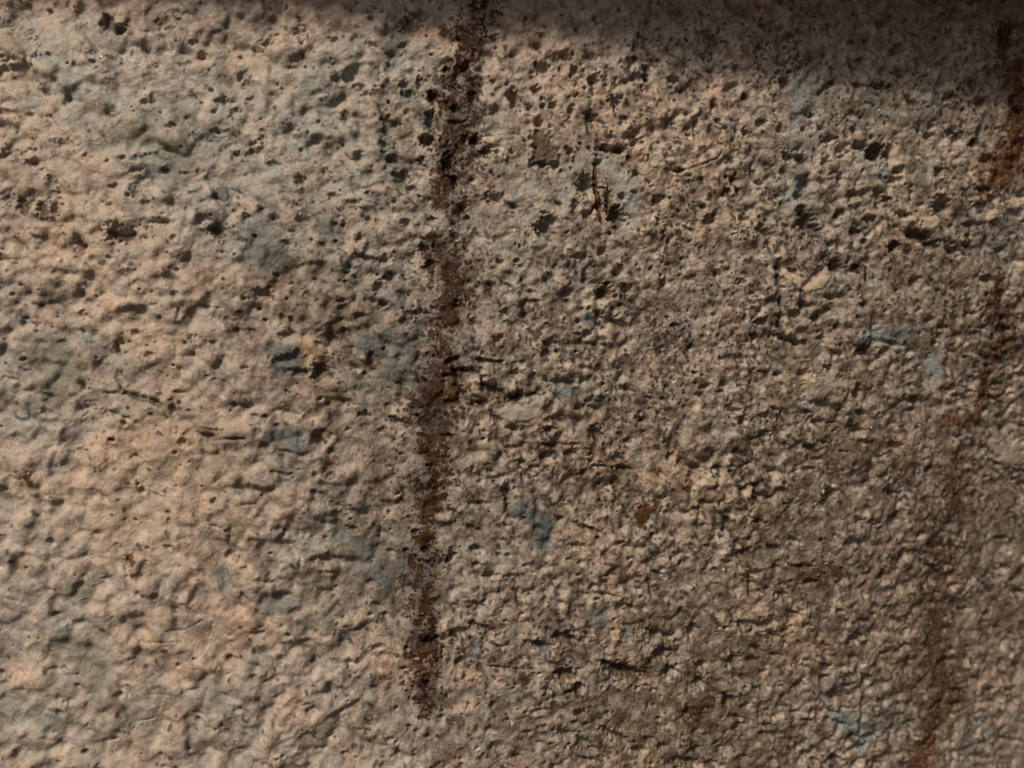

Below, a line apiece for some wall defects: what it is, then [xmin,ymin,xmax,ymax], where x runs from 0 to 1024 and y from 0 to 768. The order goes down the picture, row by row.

rust [396,0,507,720]